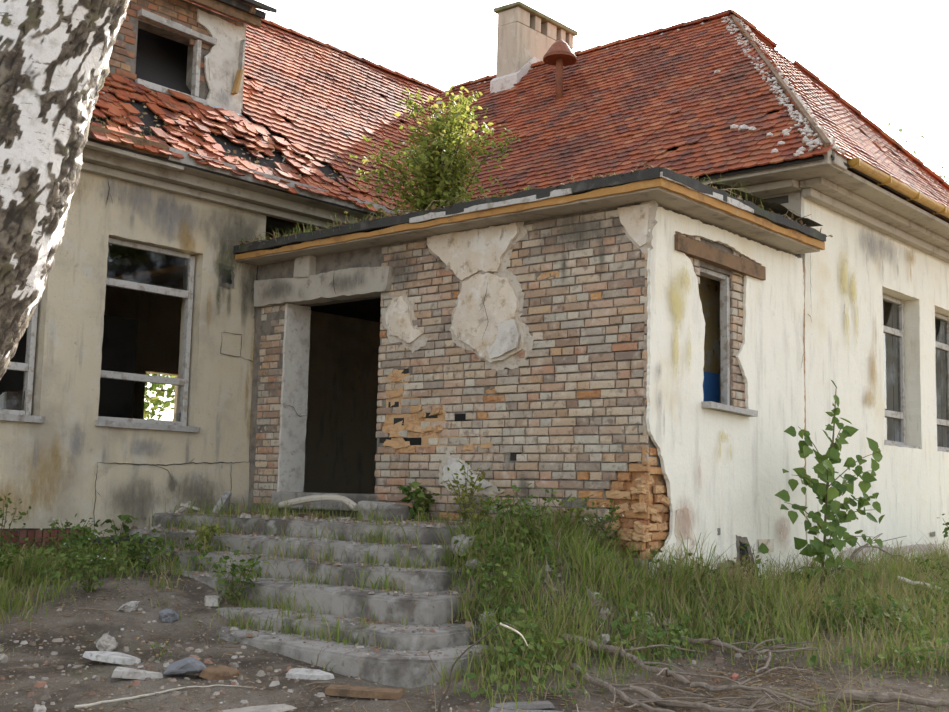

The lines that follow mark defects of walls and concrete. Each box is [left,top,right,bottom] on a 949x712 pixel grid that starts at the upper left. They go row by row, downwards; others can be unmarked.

peeling [426,221,528,283]
peeling [617,200,658,254]
peeling [382,293,431,353]
damp [672,274,691,364]
spalling [379,367,505,498]
crack [93,458,248,529]
spalling [604,462,695,561]